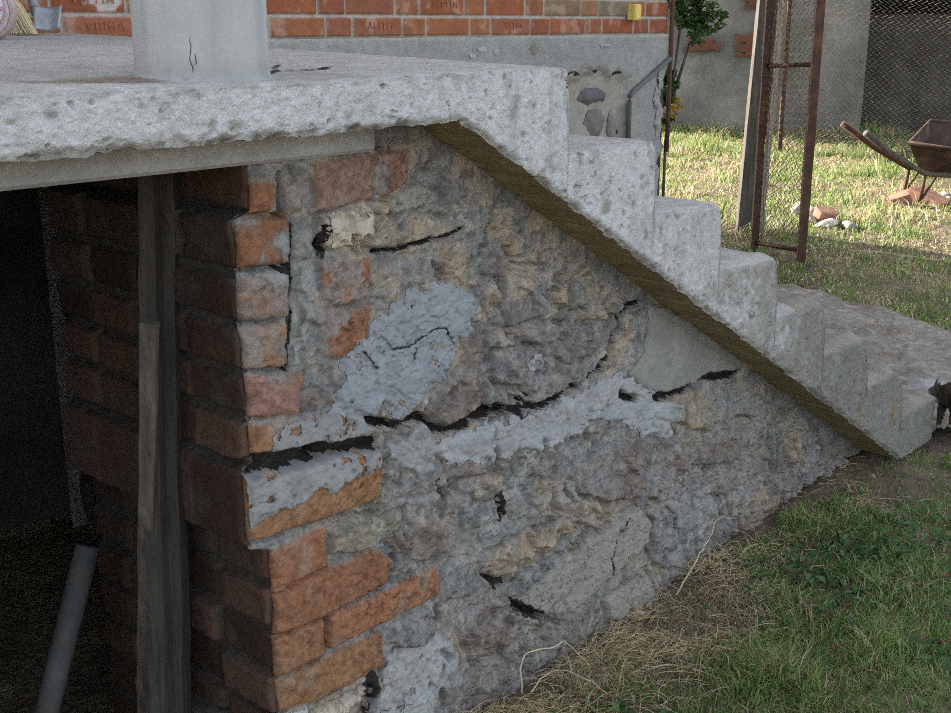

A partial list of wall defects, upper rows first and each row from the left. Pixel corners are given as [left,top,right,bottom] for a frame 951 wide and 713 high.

spalling [311,206,375,260]
crack [232,300,638,473]
spalling [361,671,381,713]